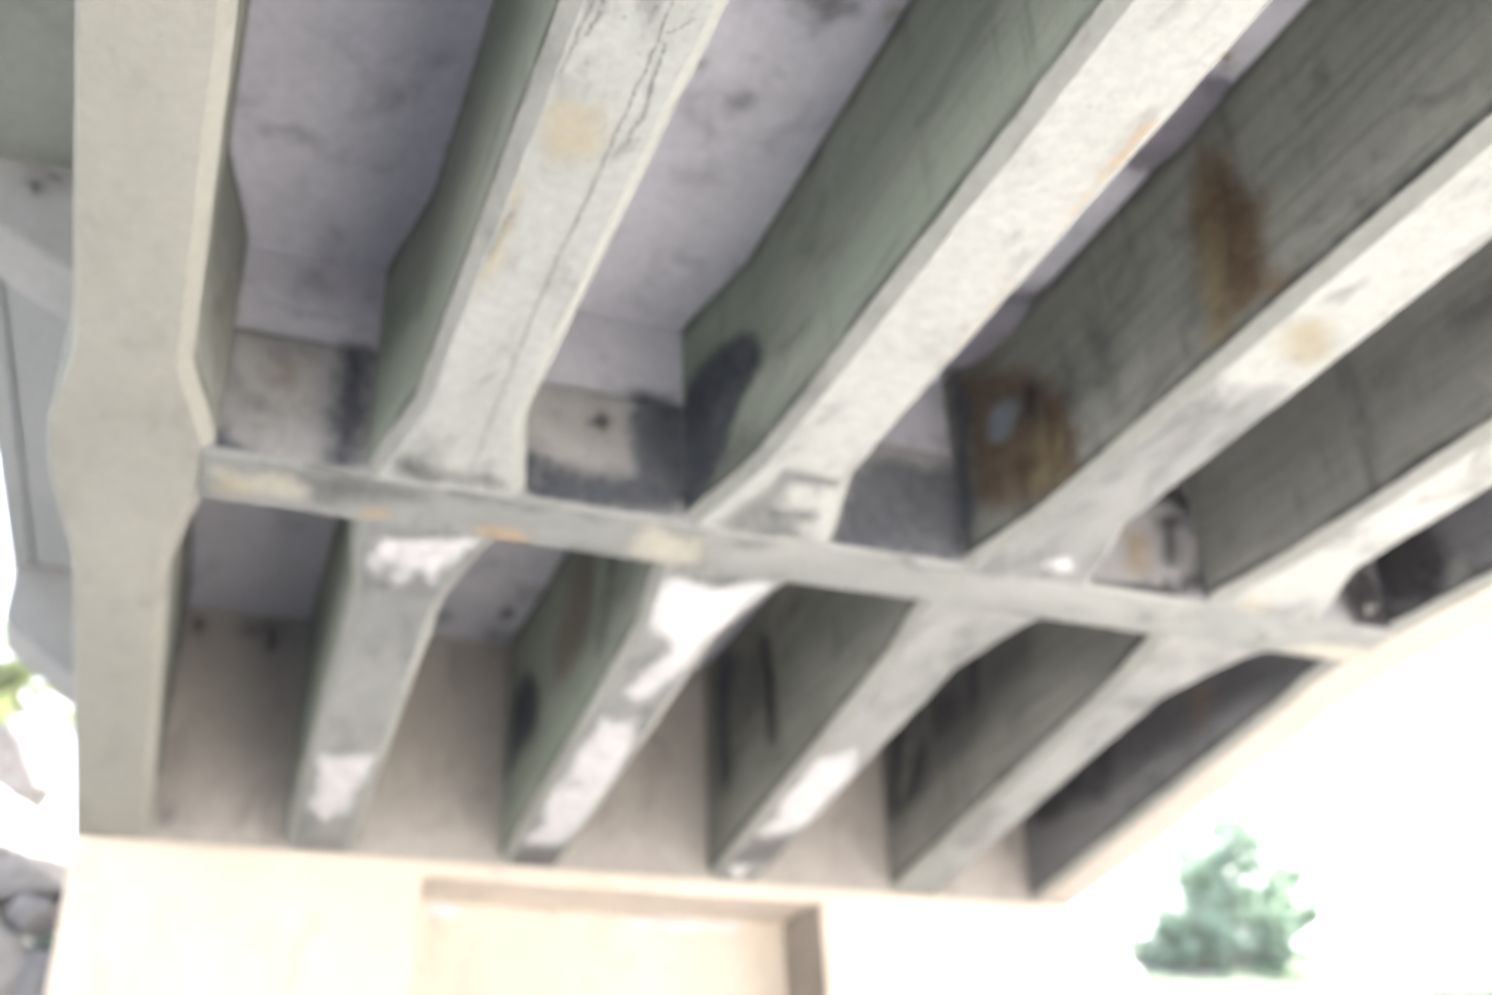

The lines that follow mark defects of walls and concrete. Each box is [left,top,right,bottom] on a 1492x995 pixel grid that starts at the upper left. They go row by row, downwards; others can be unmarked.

crack [468,0,696,476]
leakage [203,322,964,793]